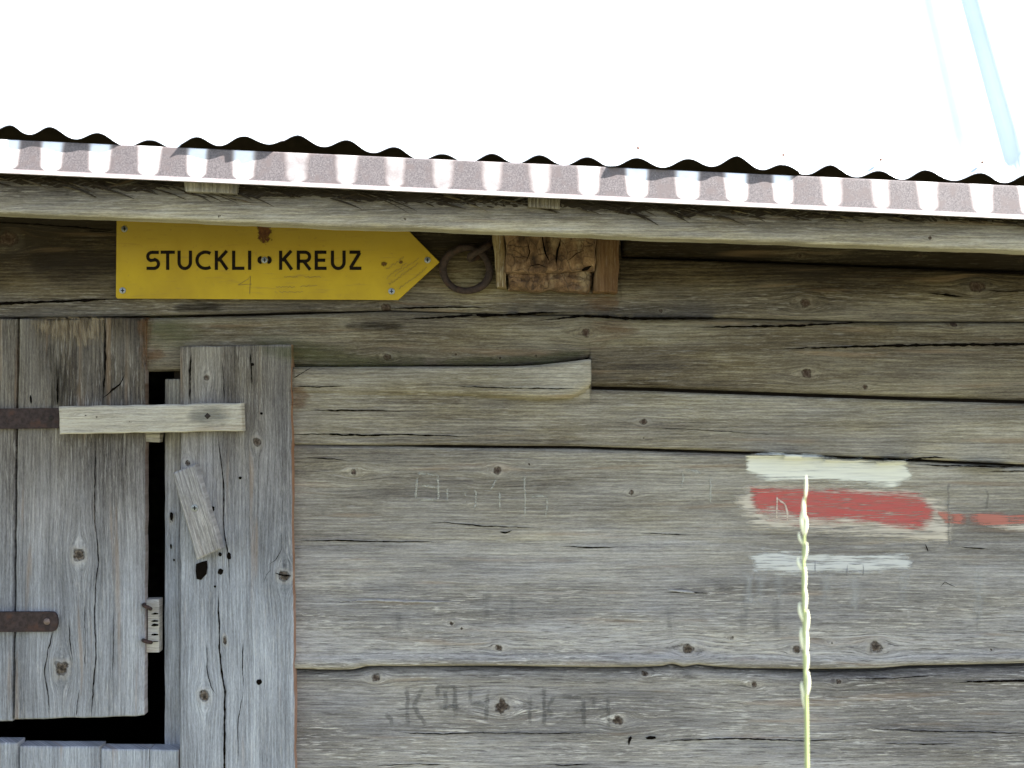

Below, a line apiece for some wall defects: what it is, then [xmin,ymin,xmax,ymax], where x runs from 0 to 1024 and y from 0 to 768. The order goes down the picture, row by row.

crack [391,306,1024,349]